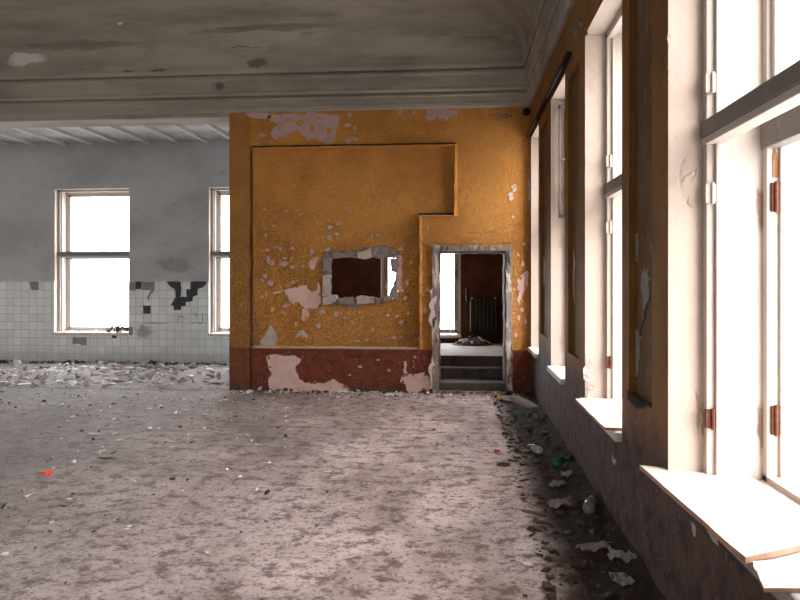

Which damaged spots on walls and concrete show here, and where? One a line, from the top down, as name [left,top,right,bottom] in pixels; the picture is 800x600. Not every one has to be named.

peeling [245,111,358,145]
peeling [167,281,207,310]
spalling [260,221,413,339]
peeling [517,242,529,324]
peeling [641,268,651,310]
flaking render [260,326,351,392]
flaking render [400,352,435,392]